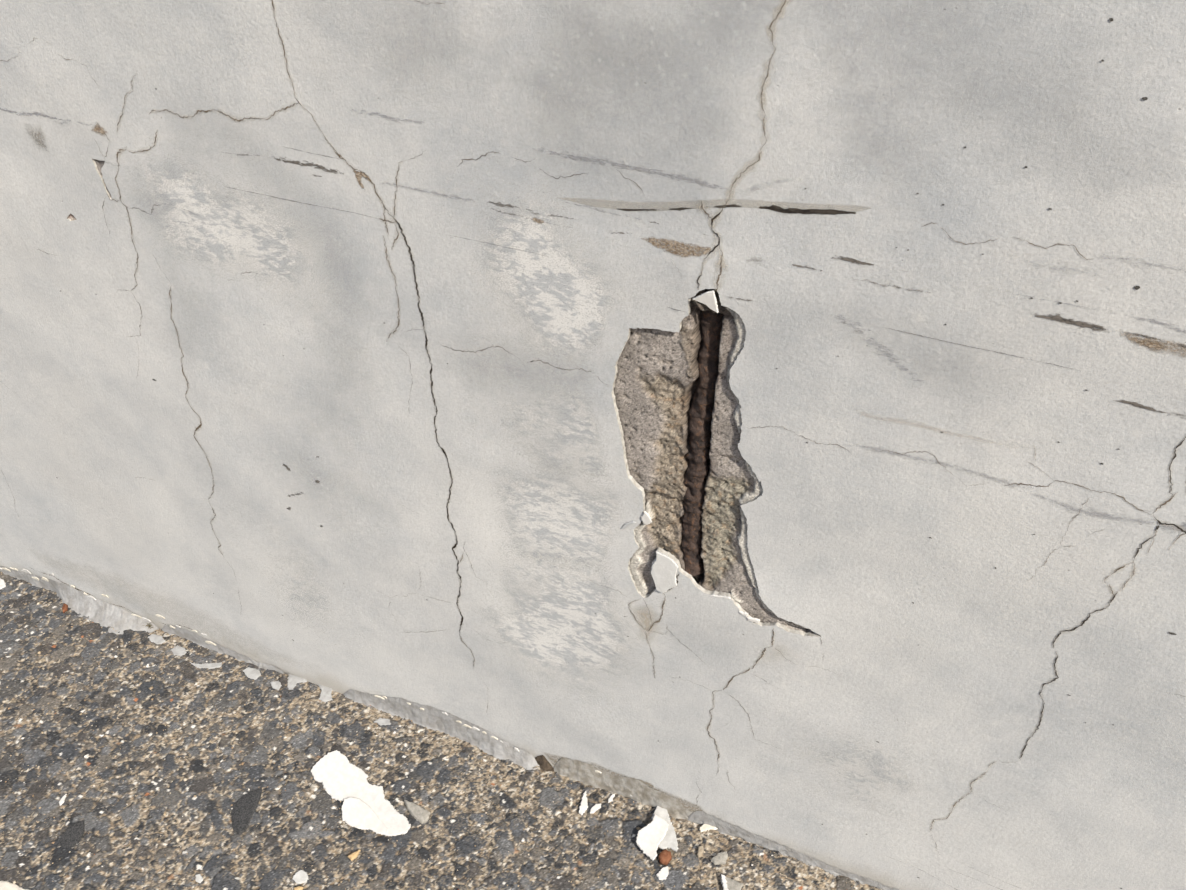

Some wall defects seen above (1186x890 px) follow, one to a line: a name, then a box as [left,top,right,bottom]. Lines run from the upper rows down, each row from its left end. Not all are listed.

crack [697,0,786,289]
crack [101,0,589,661]
crack [628,574,696,676]
spalling [611,289,821,637]
crack [697,631,791,789]
crack [931,437,1186,829]